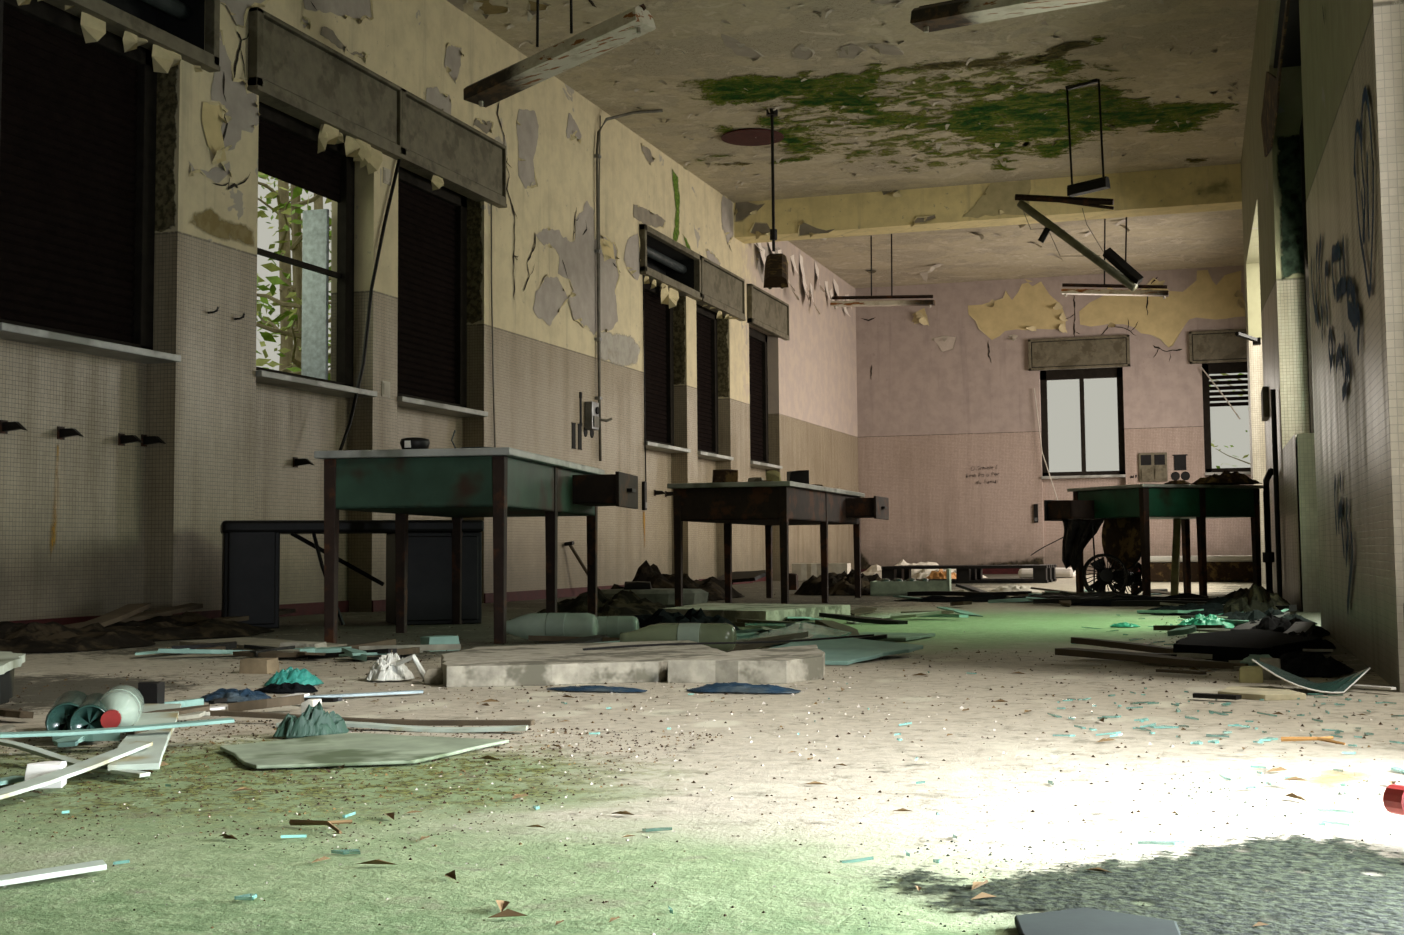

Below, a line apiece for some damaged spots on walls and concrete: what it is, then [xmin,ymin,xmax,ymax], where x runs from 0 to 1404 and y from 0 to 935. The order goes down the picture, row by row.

peeling [65,5,106,43]
peeling [301,0,374,63]
peeling [102,0,269,183]
peeling [318,124,383,175]
peeling [566,113,582,144]
peeling [830,93,960,176]
peeling [533,139,852,335]
peeling [968,270,1245,348]